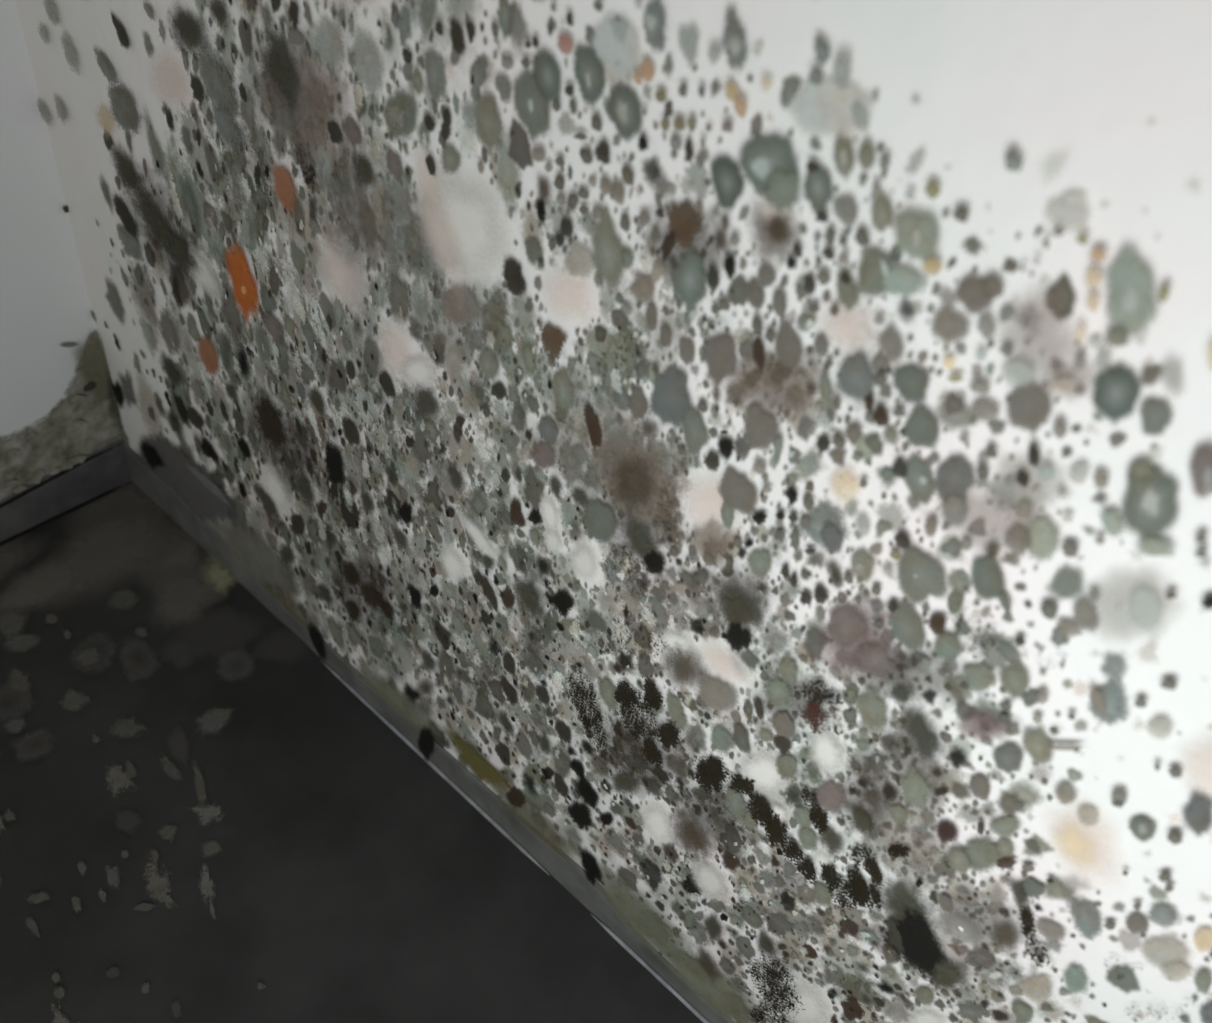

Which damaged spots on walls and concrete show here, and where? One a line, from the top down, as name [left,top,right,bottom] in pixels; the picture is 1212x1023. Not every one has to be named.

leakage [634,0,673,75]
leakage [708,7,752,82]
mould [509,179,550,264]
leakage [707,208,764,318]
leakage [781,212,870,339]
flaking render [0,331,122,500]
leakage [907,272,1100,519]
leakage [868,468,1019,565]
mould [922,571,1026,667]
leakage [1050,567,1100,601]
mould [1014,830,1053,856]
leakage [1094,872,1198,1023]